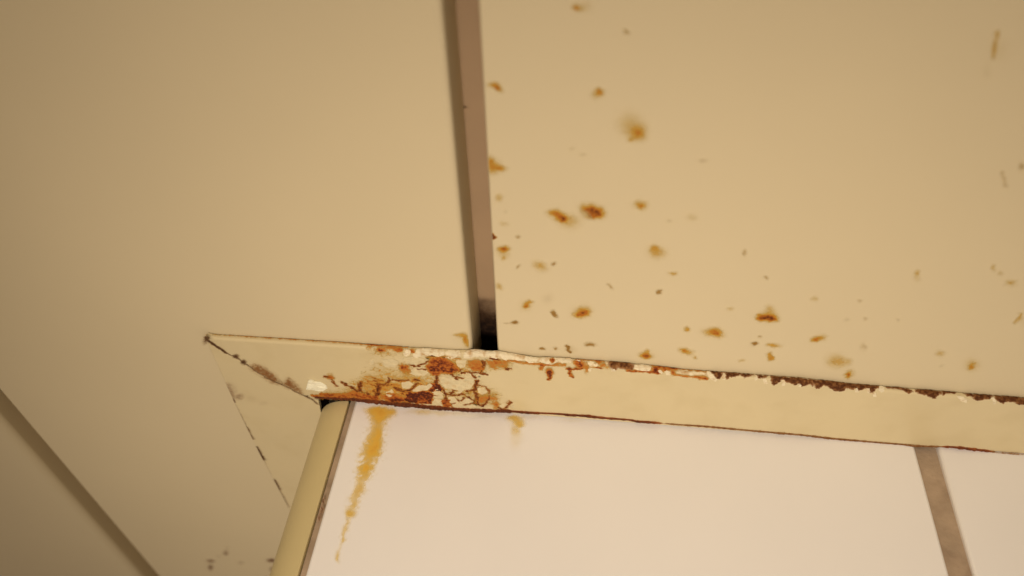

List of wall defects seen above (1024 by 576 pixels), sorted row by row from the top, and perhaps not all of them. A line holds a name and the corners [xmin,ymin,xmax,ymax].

corrosion [629,125,644,141]
corrosion [488,158,504,172]
corrosion [549,210,571,223]
corrosion [581,205,605,219]
corrosion [574,308,590,318]
corrosion [756,311,778,322]
peeling [403,347,616,372]
peeling [633,364,707,376]
corrosion [214,334,1024,517]